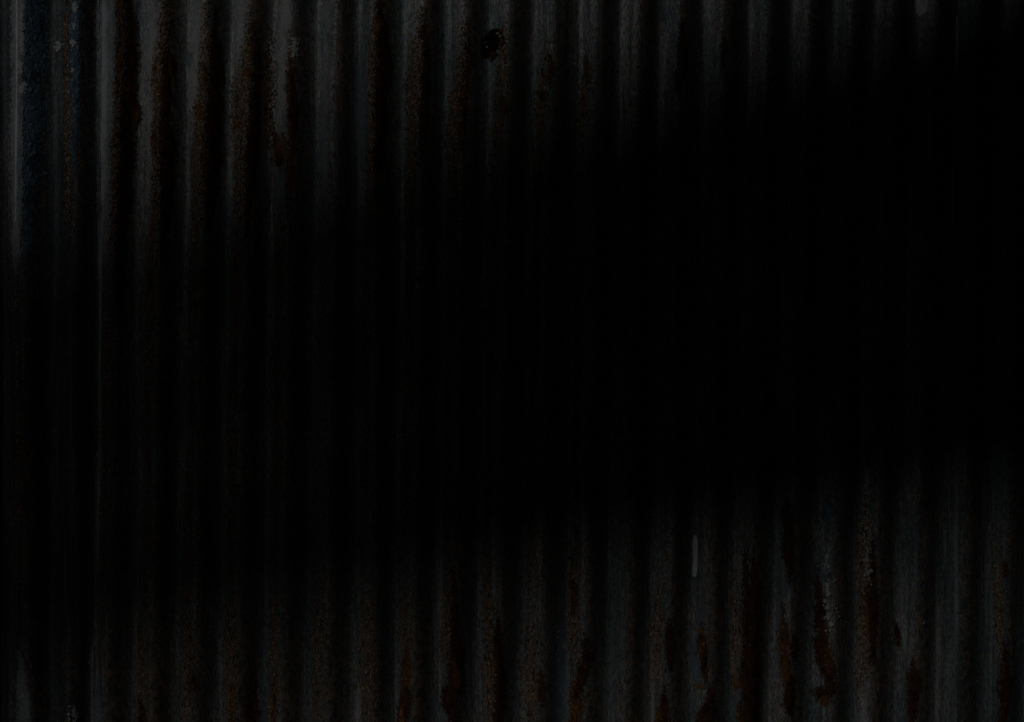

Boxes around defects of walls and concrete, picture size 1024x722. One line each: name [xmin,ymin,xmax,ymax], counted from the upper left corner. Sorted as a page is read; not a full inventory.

corrosion [776,565,837,716]